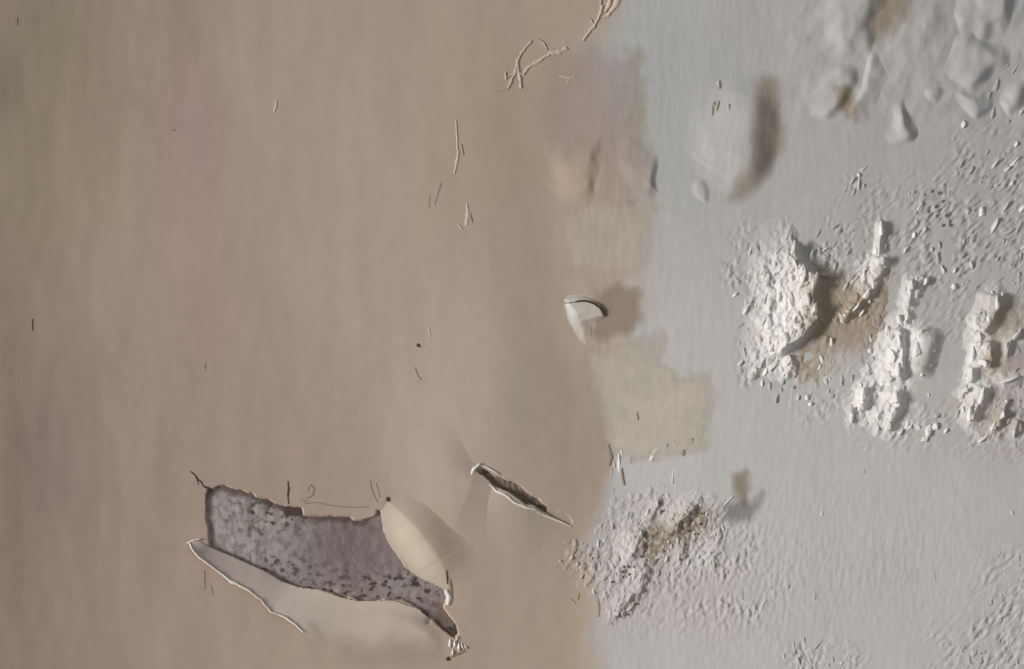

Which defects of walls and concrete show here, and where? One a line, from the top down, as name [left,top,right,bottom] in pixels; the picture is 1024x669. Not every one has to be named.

leakage [589,287,708,458]
spalling [732,190,1024,449]
peeling [186,424,734,661]